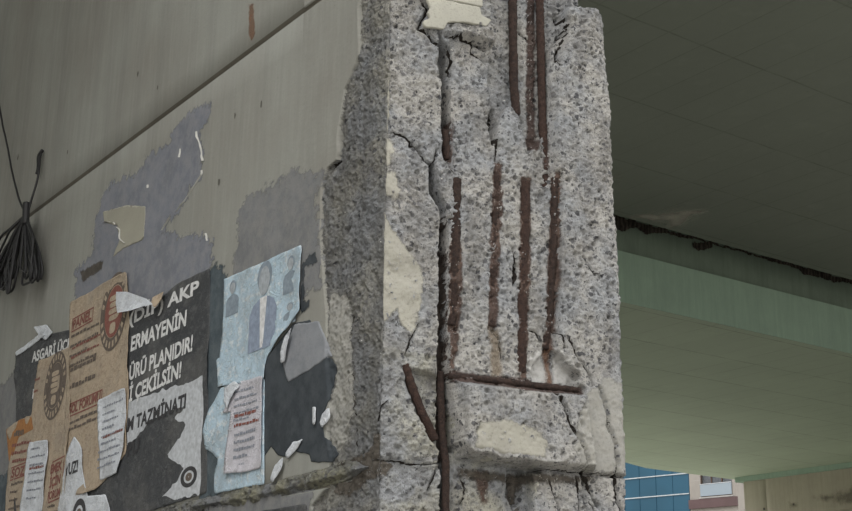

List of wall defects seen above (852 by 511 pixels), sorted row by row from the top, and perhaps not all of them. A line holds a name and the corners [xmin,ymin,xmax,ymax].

crack [417,1,483,78]
crack [553,3,574,65]
crack [392,132,453,172]
crack [487,116,498,161]
peeling [74,102,215,306]
corrosion [436,0,583,395]
spalling [158,0,625,511]
spalling [613,214,852,284]
crack [529,331,591,383]
crack [374,459,436,490]
corrosion [475,472,489,503]
crack [528,394,621,510]